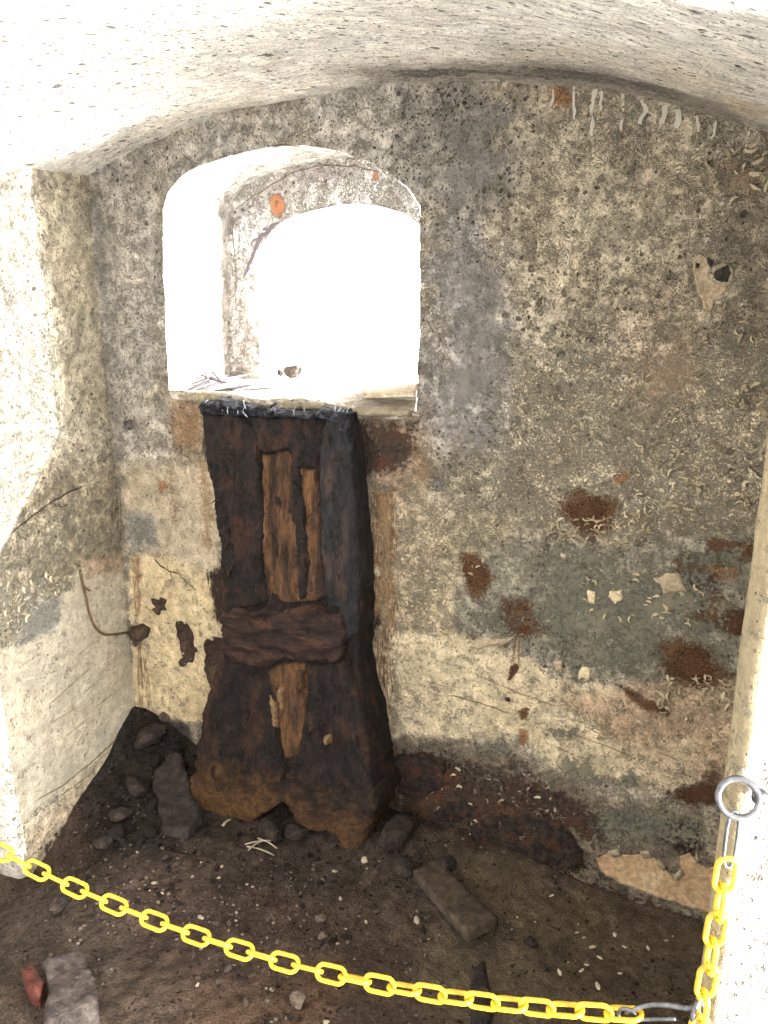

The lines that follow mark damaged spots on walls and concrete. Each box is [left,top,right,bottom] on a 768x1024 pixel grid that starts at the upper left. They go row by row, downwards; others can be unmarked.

corrosion [269,194,285,217]
spalling [693,254,762,344]
peeling [711,382,768,416]
crack [10,485,84,534]
corrosion [557,488,621,538]
corrosion [460,552,495,599]
corrosion [490,598,545,680]
corrosion [656,637,736,689]
corrosion [666,759,721,808]
leakage [392,749,705,919]
spalling [596,849,714,912]